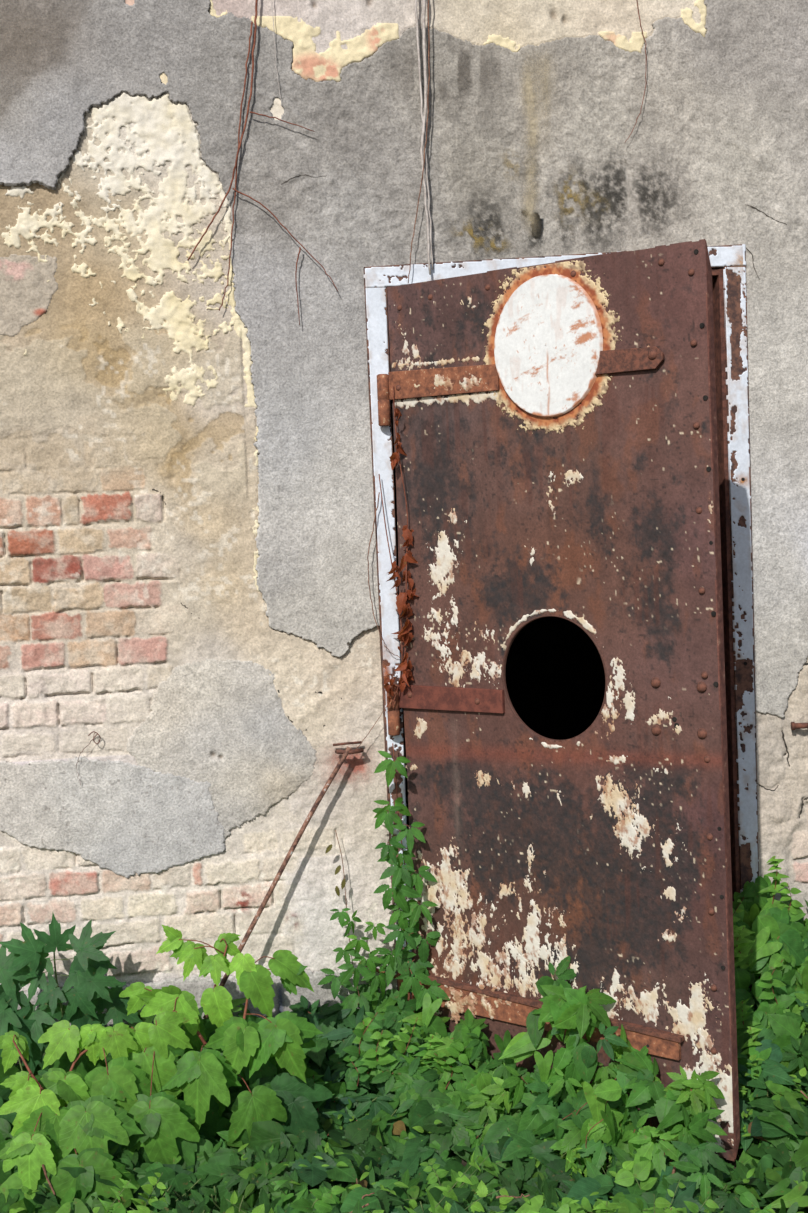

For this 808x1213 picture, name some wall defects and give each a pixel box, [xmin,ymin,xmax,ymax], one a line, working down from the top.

flaking render [208,0,707,82]
flaking render [0,73,621,1024]
flaking render [708,244,808,920]
peeling [610,657,672,726]
peeling [595,773,674,868]
crack [757,730,808,818]
peeling [599,968,660,1027]
peeling [671,982,733,1153]